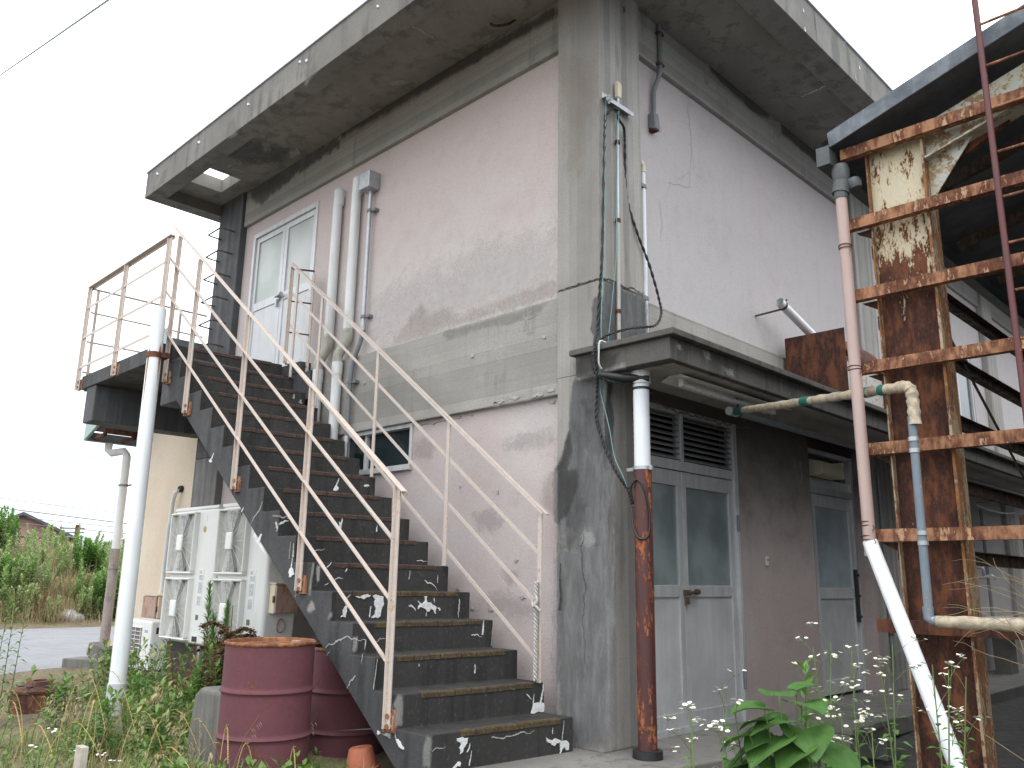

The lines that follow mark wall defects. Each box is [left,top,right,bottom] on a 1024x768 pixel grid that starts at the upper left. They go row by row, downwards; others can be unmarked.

damp [228,9,554,204]
damp [553,282,648,750]
peeling [341,594,384,618]
peeling [409,596,441,616]
peeling [527,682,544,714]
peeling [453,737,472,768]
peeling [545,726,569,754]